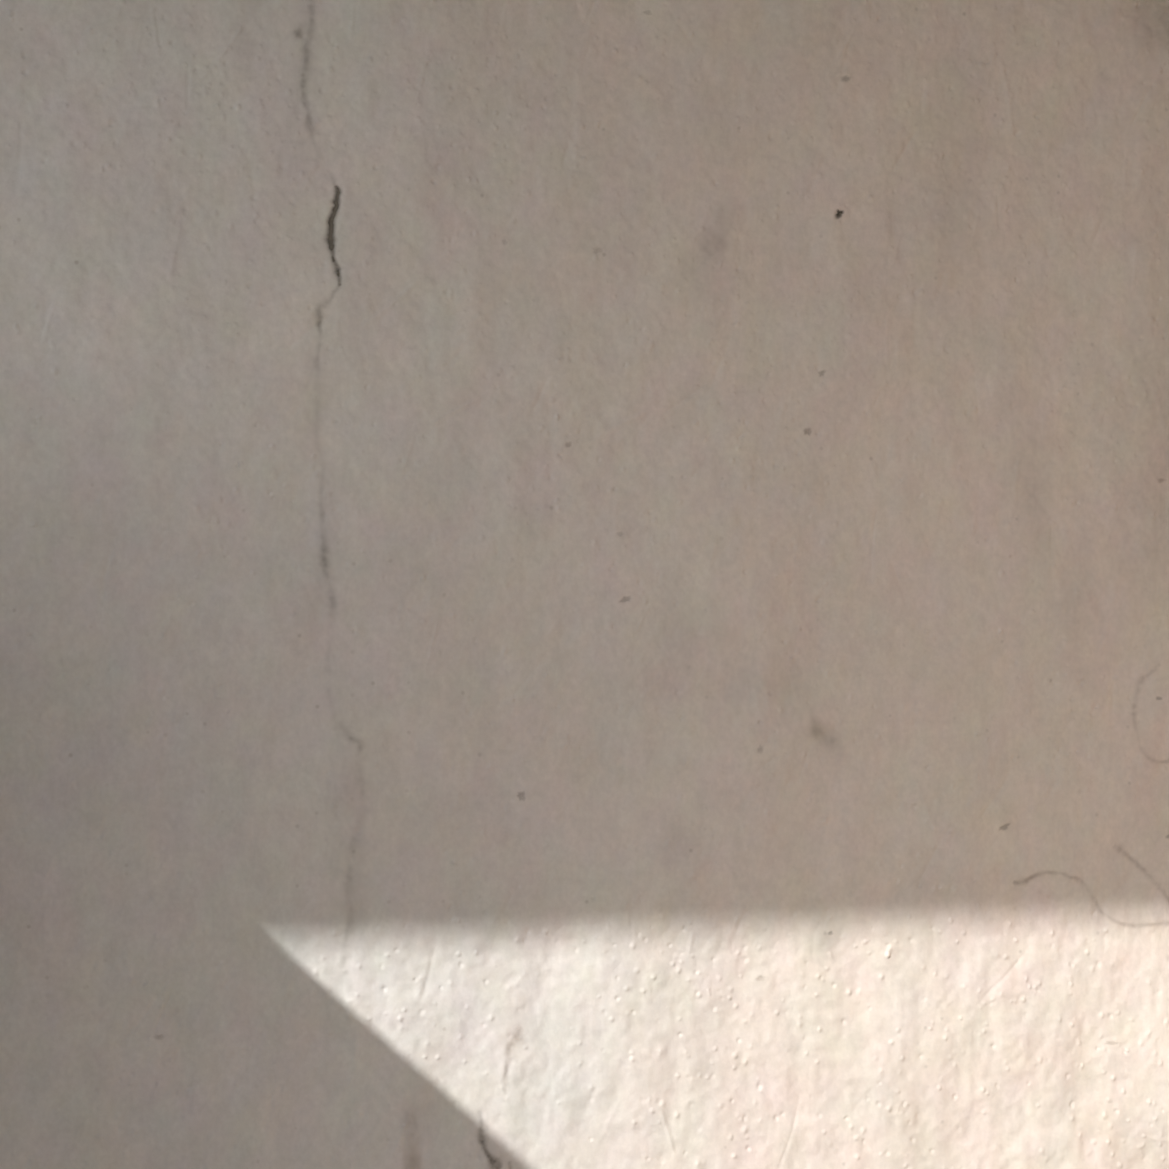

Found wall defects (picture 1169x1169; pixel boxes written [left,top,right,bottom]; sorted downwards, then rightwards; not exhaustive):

crack [327,186,340,277]